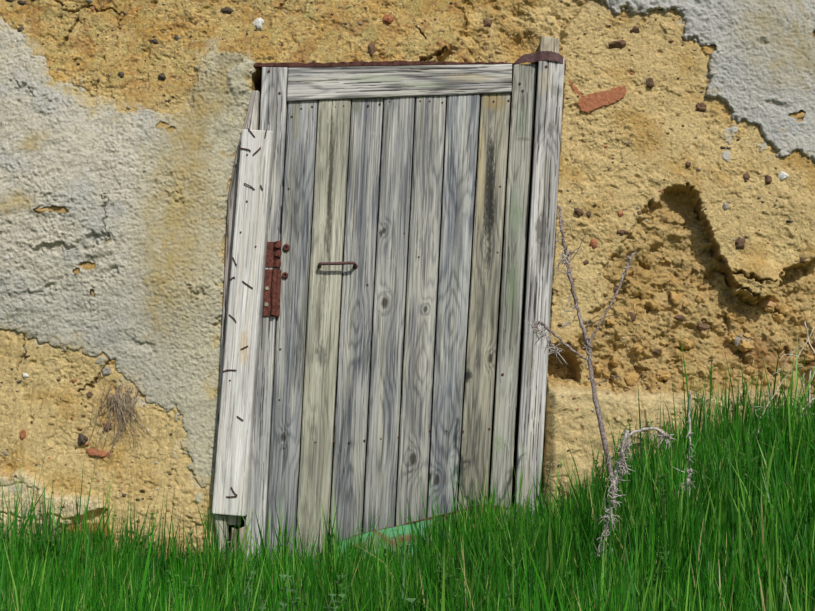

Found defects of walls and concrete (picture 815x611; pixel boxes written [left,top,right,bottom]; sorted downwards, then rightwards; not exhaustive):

crack [54,0,125,45]
flaking render [430,0,815,163]
flaking render [0,16,256,559]
spalling [547,182,815,395]